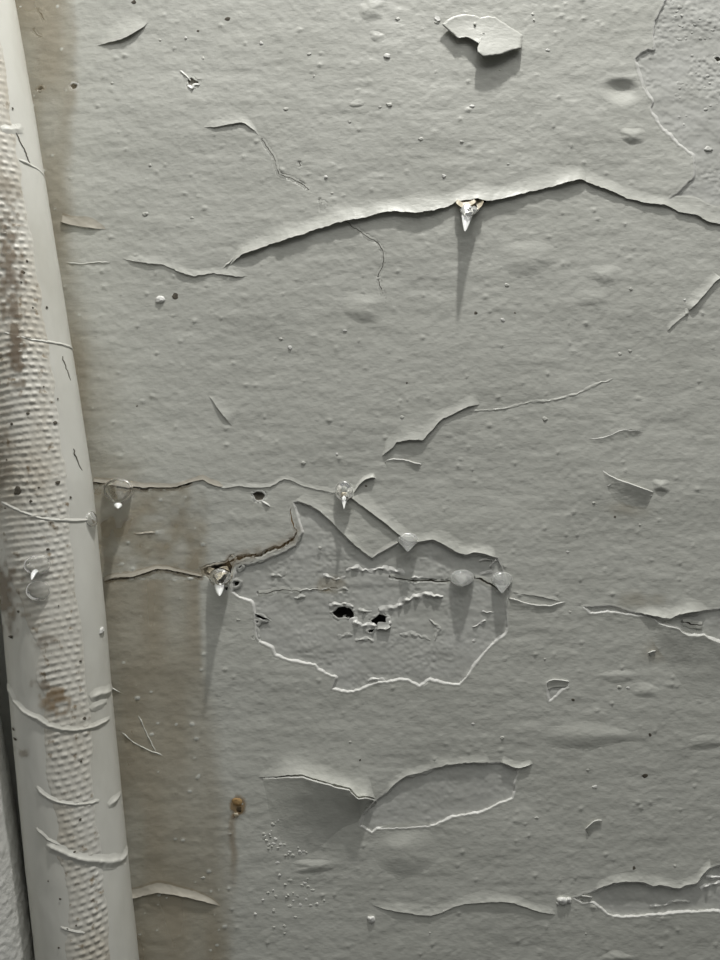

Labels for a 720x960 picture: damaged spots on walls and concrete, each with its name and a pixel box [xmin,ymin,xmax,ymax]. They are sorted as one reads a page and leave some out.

peeling [122,0,720,277]
peeling [667,272,720,331]
peeling [382,393,479,471]
peeling [603,471,654,509]
peeling [200,485,566,695]
peeling [581,597,720,698]
rust [231,797,245,817]
peeling [258,752,533,853]
peeling [132,880,221,906]
peeling [372,890,555,916]
peeling [571,859,720,920]